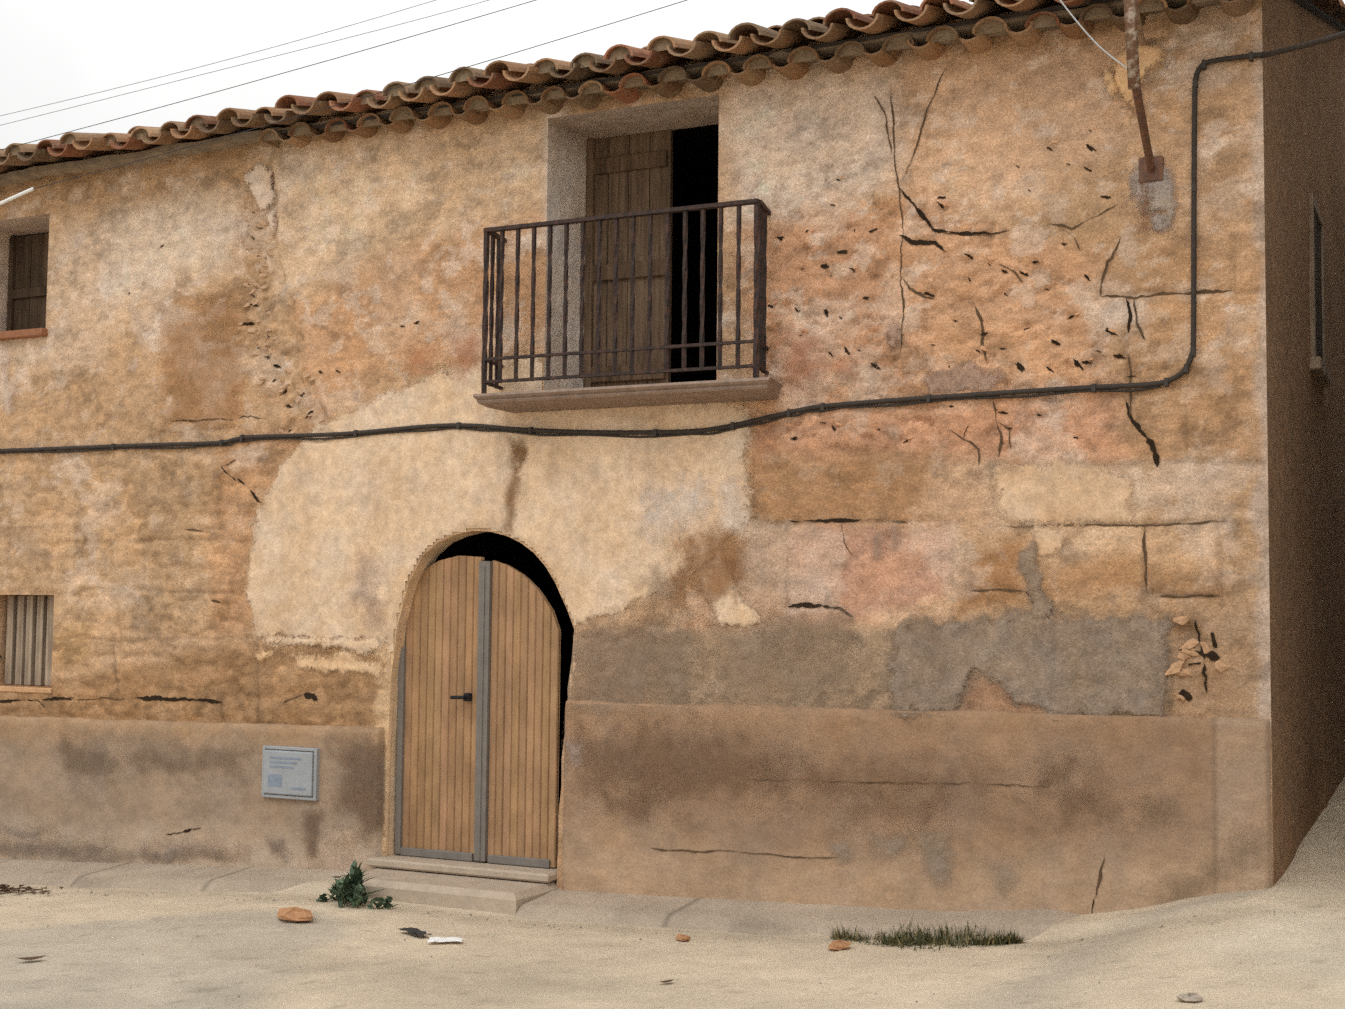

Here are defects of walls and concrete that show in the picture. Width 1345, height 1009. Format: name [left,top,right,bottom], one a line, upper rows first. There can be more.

crack [873,69,1023,350]
crack [975,306,987,362]
crack [1051,205,1234,467]
crack [950,401,1011,464]
water stain [642,477,746,606]
crack [788,602,853,617]
spalling [1165,616,1231,701]
crack [0,695,222,707]
water stain [341,745,386,830]
water stain [304,814,317,855]
crack [652,848,839,858]
crack [1091,854,1105,914]